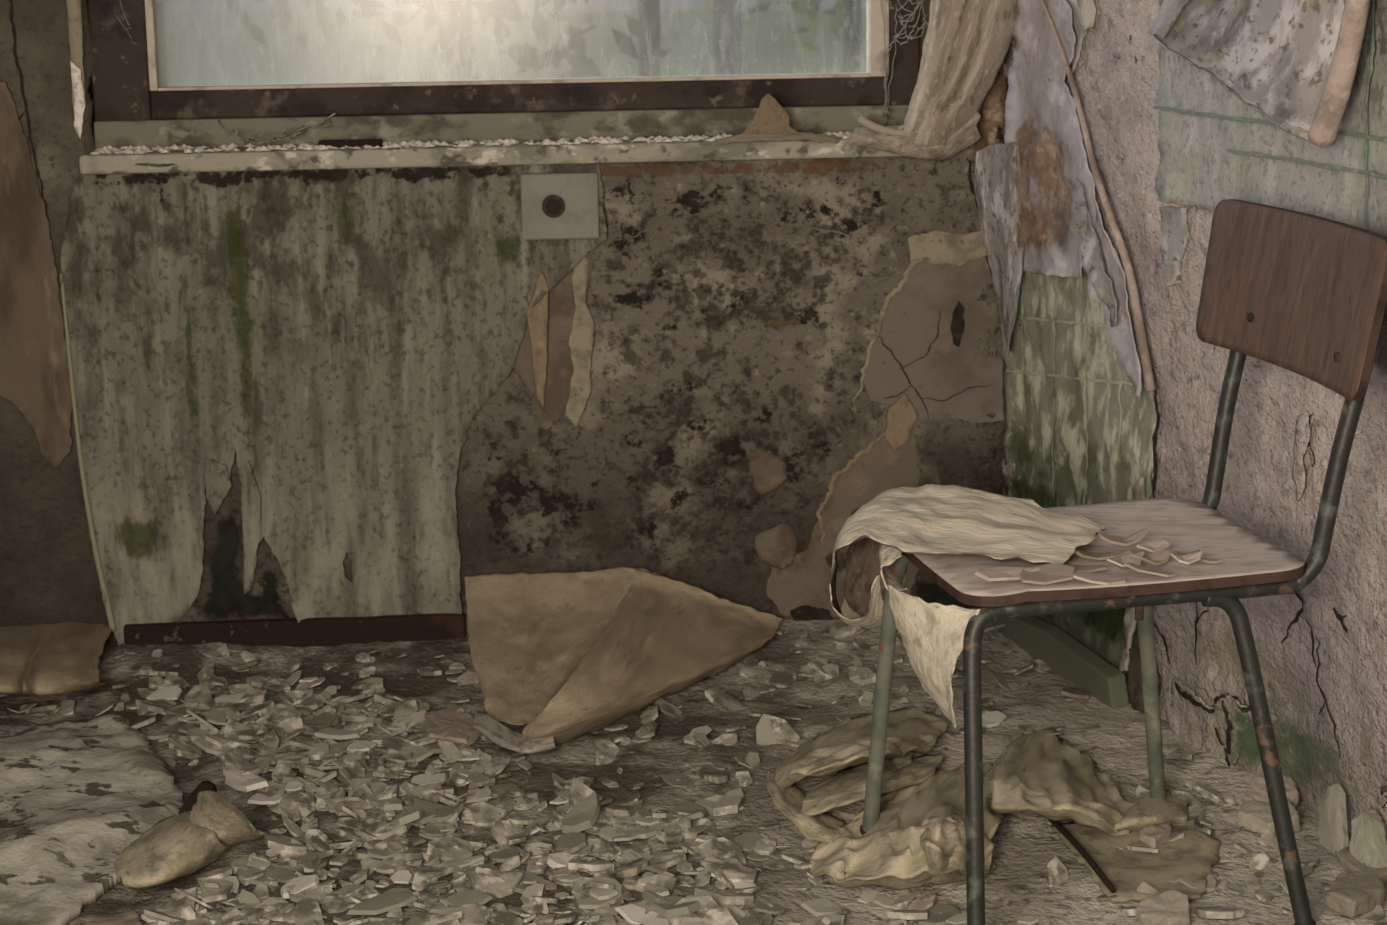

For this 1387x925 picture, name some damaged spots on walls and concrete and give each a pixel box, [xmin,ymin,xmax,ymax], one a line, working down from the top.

crack [9,0,50,222]
water stain [96,166,510,204]
water stain [608,178,884,330]
crack [966,158,998,306]
peeling [1004,0,1156,398]
peeling [514,251,595,427]
water stain [606,382,835,546]
flaking render [766,230,1004,621]
crack [873,311,990,418]
crack [1281,593,1347,757]